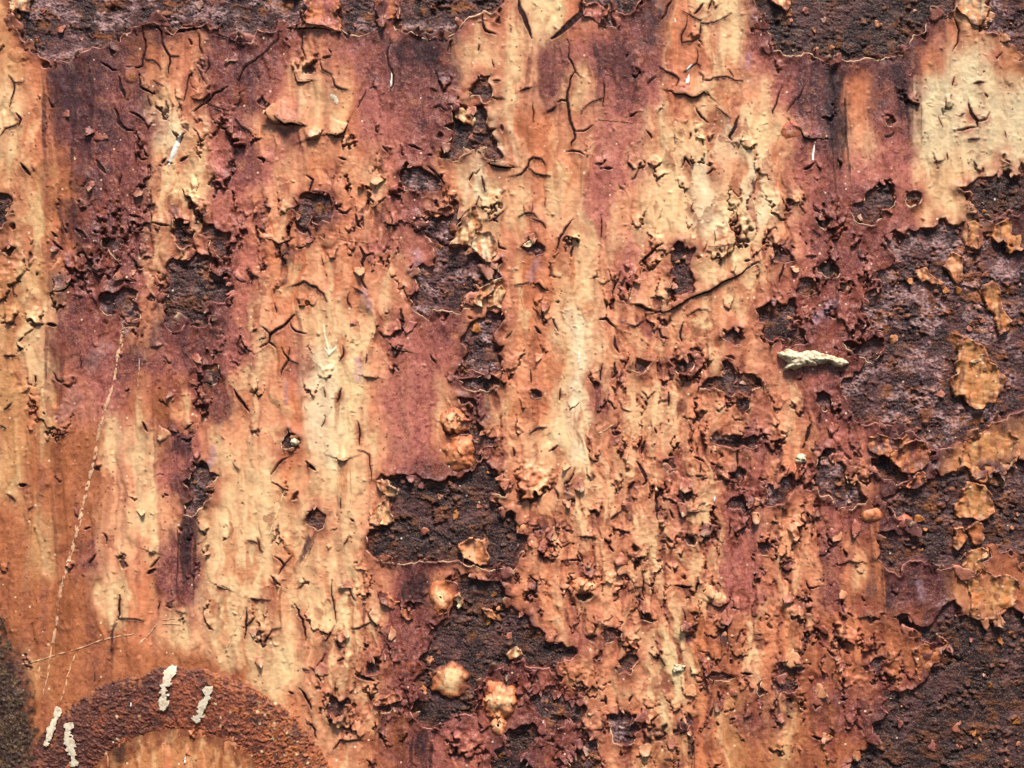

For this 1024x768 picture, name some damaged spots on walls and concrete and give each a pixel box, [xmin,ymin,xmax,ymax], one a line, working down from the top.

corrosion [3,0,307,70]
crack [96,9,394,188]
crack [478,0,605,154]
crack [648,0,743,174]
crack [599,212,756,380]
corrosion [840,164,1024,451]
peeling [915,218,1024,289]
peeling [949,336,1007,411]
peeling [458,537,490,566]
corrosion [366,398,645,768]
corrosion [840,457,1024,768]
peeling [952,424,1021,620]